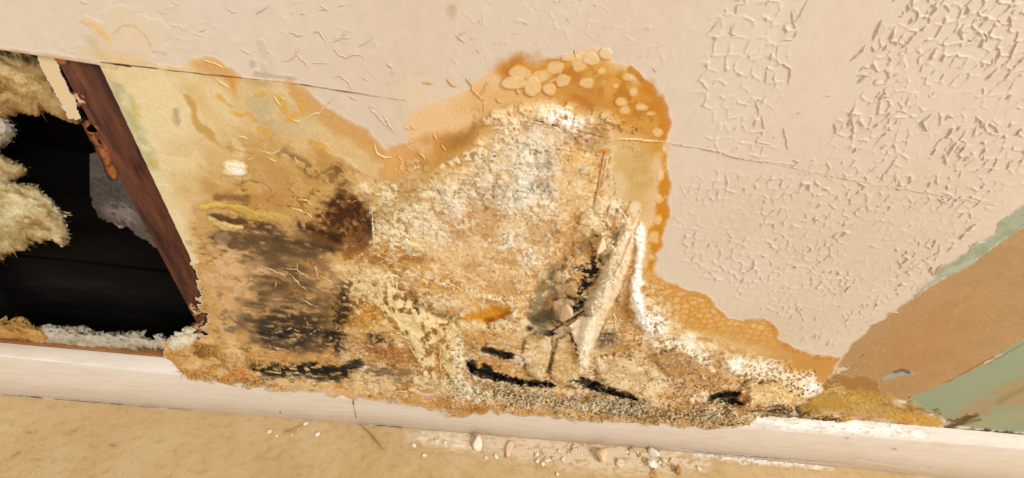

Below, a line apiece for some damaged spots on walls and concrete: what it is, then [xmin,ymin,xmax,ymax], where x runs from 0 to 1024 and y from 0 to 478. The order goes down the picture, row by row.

spalling [0,287,37,327]
spalling [10,106,102,150]
damp [0,4,417,385]
crack [101,62,406,101]
peeling [253,0,417,134]
flaking render [148,98,825,430]
damp [374,46,1024,440]
peeling [432,0,1024,353]
crack [534,120,999,206]